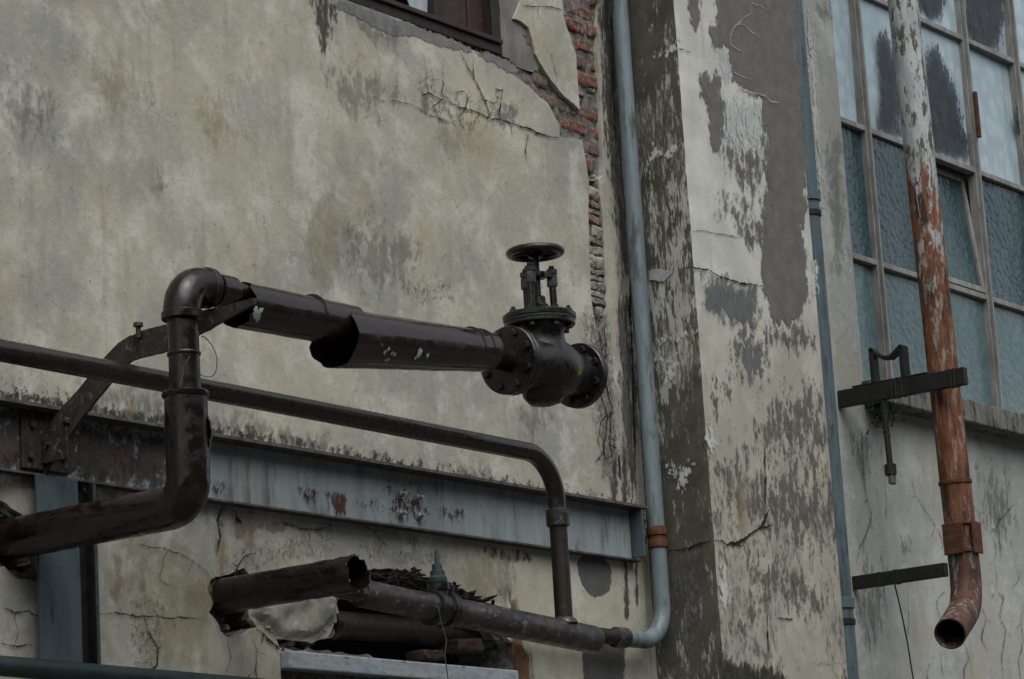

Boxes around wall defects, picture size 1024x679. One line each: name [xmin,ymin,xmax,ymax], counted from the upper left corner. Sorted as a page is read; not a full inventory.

crack [730,0,780,104]
crack [372,52,558,159]
spalling [530,0,622,481]
crack [679,266,762,287]
peeling [688,0,853,654]
rust [298,475,465,534]
crack [669,447,776,552]
crack [100,505,335,669]
leakage [577,556,639,618]
crack [226,629,280,678]